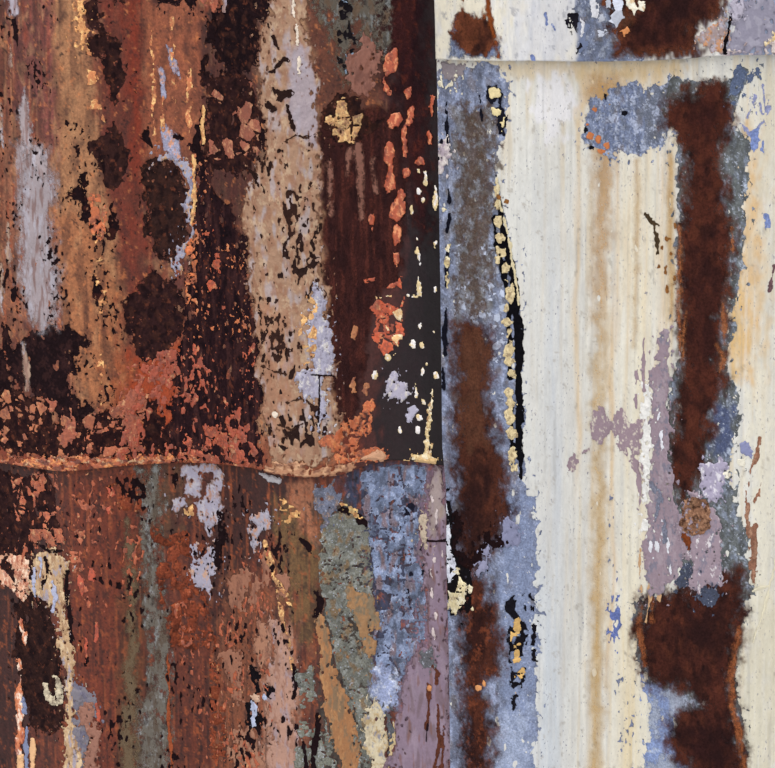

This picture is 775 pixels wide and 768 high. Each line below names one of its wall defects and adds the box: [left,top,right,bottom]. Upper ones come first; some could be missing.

corrosion [448,0,502,59]
corrosion [613,0,720,57]
corrosion [0,0,435,768]
peeling [357,60,547,768]
corrosion [448,101,518,768]
peeling [565,0,775,625]
corrosion [657,77,739,500]
peeling [164,463,305,768]
peeling [633,638,702,768]
corrosion [629,548,752,768]
peeling [726,666,751,728]